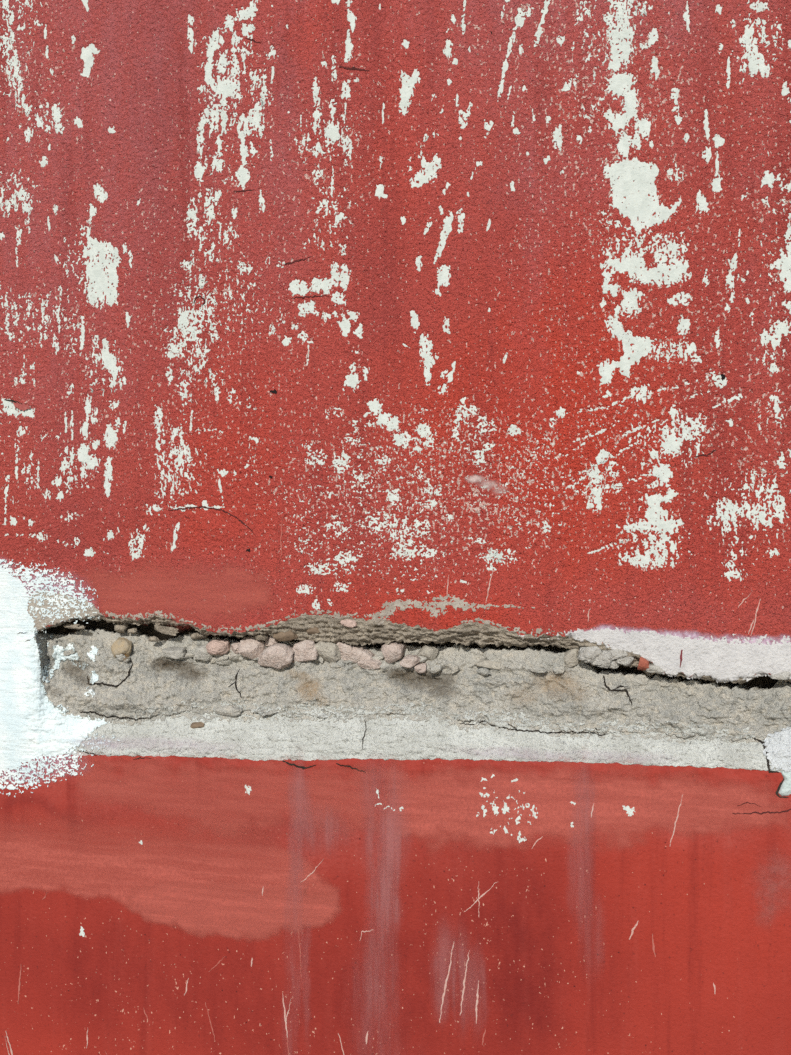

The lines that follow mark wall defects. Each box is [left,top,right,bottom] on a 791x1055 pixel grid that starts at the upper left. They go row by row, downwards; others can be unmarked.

spalling [0,0,791,793]
crack [19,620,252,642]
crack [340,641,568,652]
crack [600,665,779,705]
peeling [476,774,538,843]
crack [732,802,791,814]